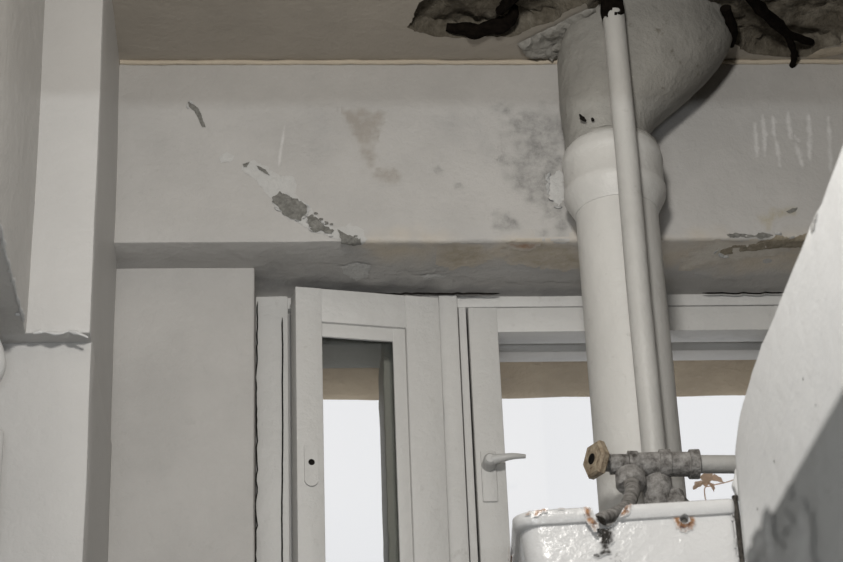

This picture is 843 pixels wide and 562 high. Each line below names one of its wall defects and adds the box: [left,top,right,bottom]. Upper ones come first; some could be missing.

spalling [407,0,601,61]
spalling [708,0,843,68]
peeling [242,160,368,246]
water stain [254,97,582,298]
water stain [660,220,811,281]
spalling [678,202,817,271]